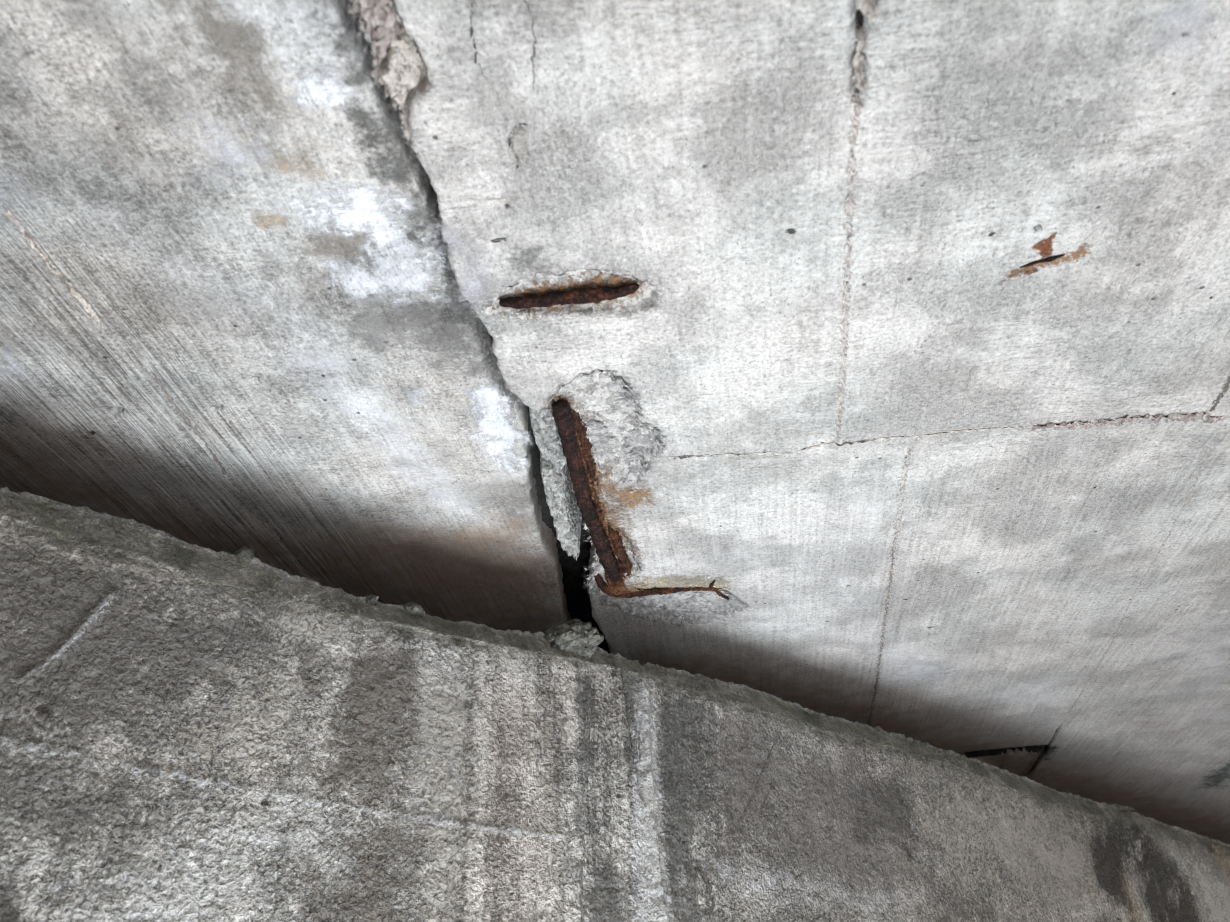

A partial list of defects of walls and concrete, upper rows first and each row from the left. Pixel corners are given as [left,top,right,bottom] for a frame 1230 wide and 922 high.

crack [470,0,487,80]
crack [523,0,537,91]
crack [470,124,531,201]
corrosion [492,271,643,320]
corrosion [1003,232,1089,281]
spalling [546,370,673,503]
crack [663,0,1230,769]
corrosion [544,396,731,599]
crack [527,406,632,747]
spalling [584,520,751,628]